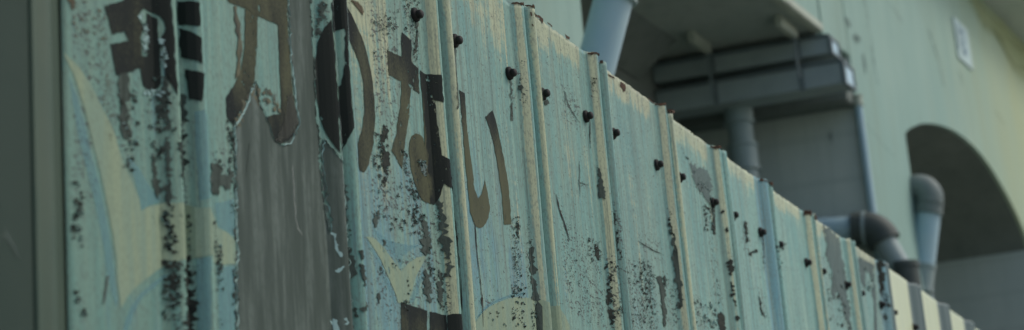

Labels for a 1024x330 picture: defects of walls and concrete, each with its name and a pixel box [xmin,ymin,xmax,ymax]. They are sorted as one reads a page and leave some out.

peeling [117,13,200,330]
peeling [210,0,455,330]
peeling [538,47,740,330]
peeling [823,225,853,330]
peeling [858,255,891,330]